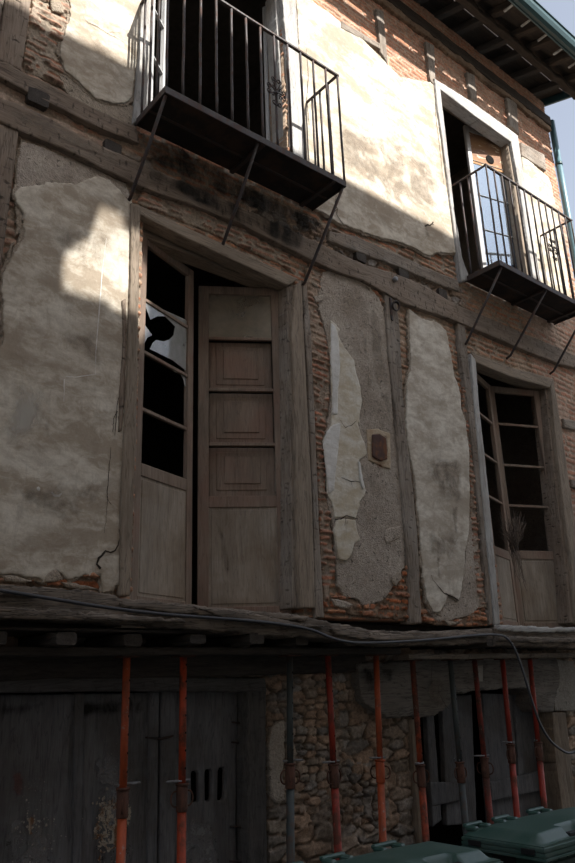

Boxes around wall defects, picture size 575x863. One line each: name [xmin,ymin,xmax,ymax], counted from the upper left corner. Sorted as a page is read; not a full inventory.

spalling [22,0,71,88]
water stain [153,143,277,221]
spalling [137,192,294,274]
crack [96,398,120,569]
flaking render [305,268,410,620]
spalling [421,387,492,627]
spalling [0,569,100,591]